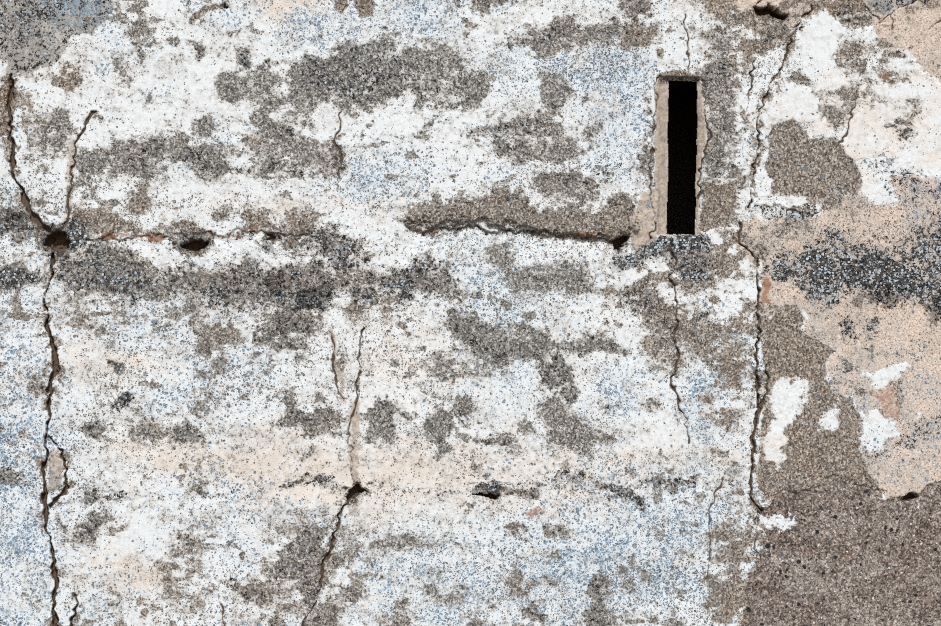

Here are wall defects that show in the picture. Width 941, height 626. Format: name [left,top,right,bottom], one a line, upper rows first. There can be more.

crack [6,73,97,626]
crack [302,327,365,626]
crack [648,74,690,446]
crack [682,14,713,200]
crack [704,477,725,581]
crack [738,0,814,553]
spalling [689,0,941,626]
crack [837,0,918,145]